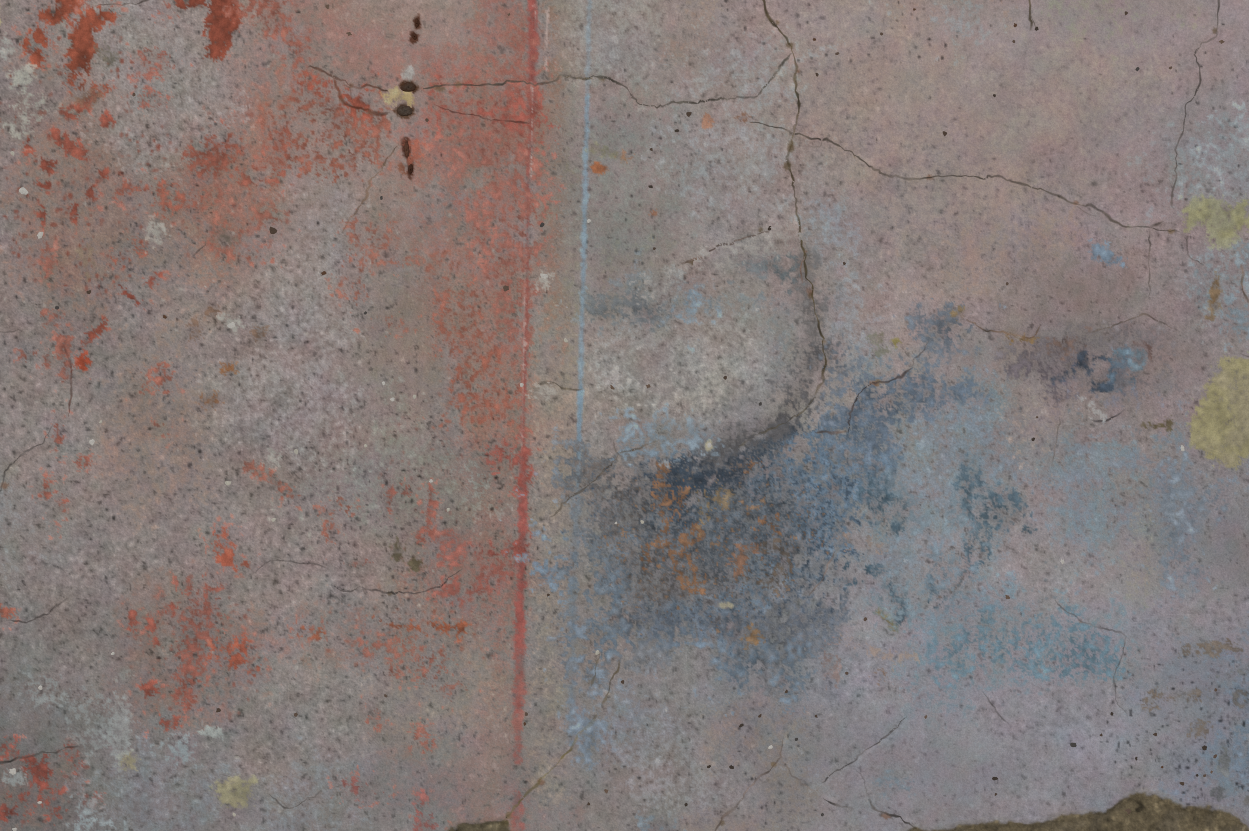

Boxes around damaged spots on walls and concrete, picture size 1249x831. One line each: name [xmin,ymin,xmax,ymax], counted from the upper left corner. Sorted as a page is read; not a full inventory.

crack [308,65,400,233]
crack [421,0,1220,489]
crack [1240,262,1249,304]
flaking render [894,745,1249,831]